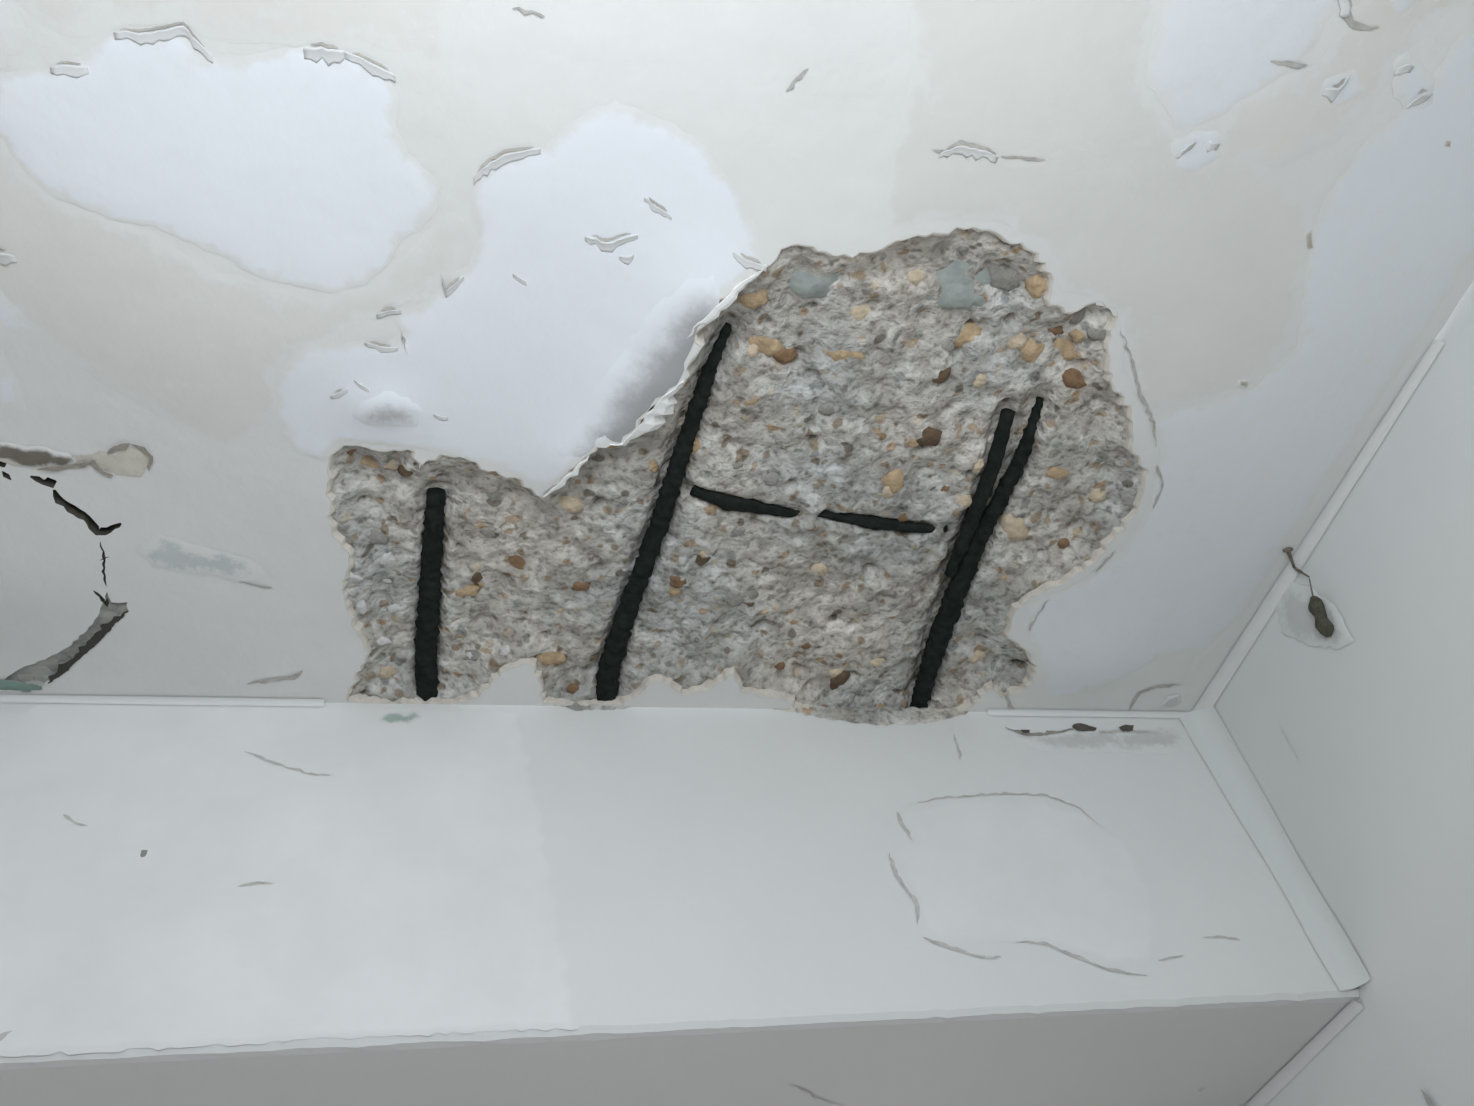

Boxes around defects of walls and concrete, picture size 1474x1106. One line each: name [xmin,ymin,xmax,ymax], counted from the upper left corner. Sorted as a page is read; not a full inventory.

peeling [0,0,467,293]
spalling [273,0,1474,726]
peeling [0,442,153,477]
crack [0,461,121,607]
water stain [133,533,270,584]
water stain [1276,581,1354,650]